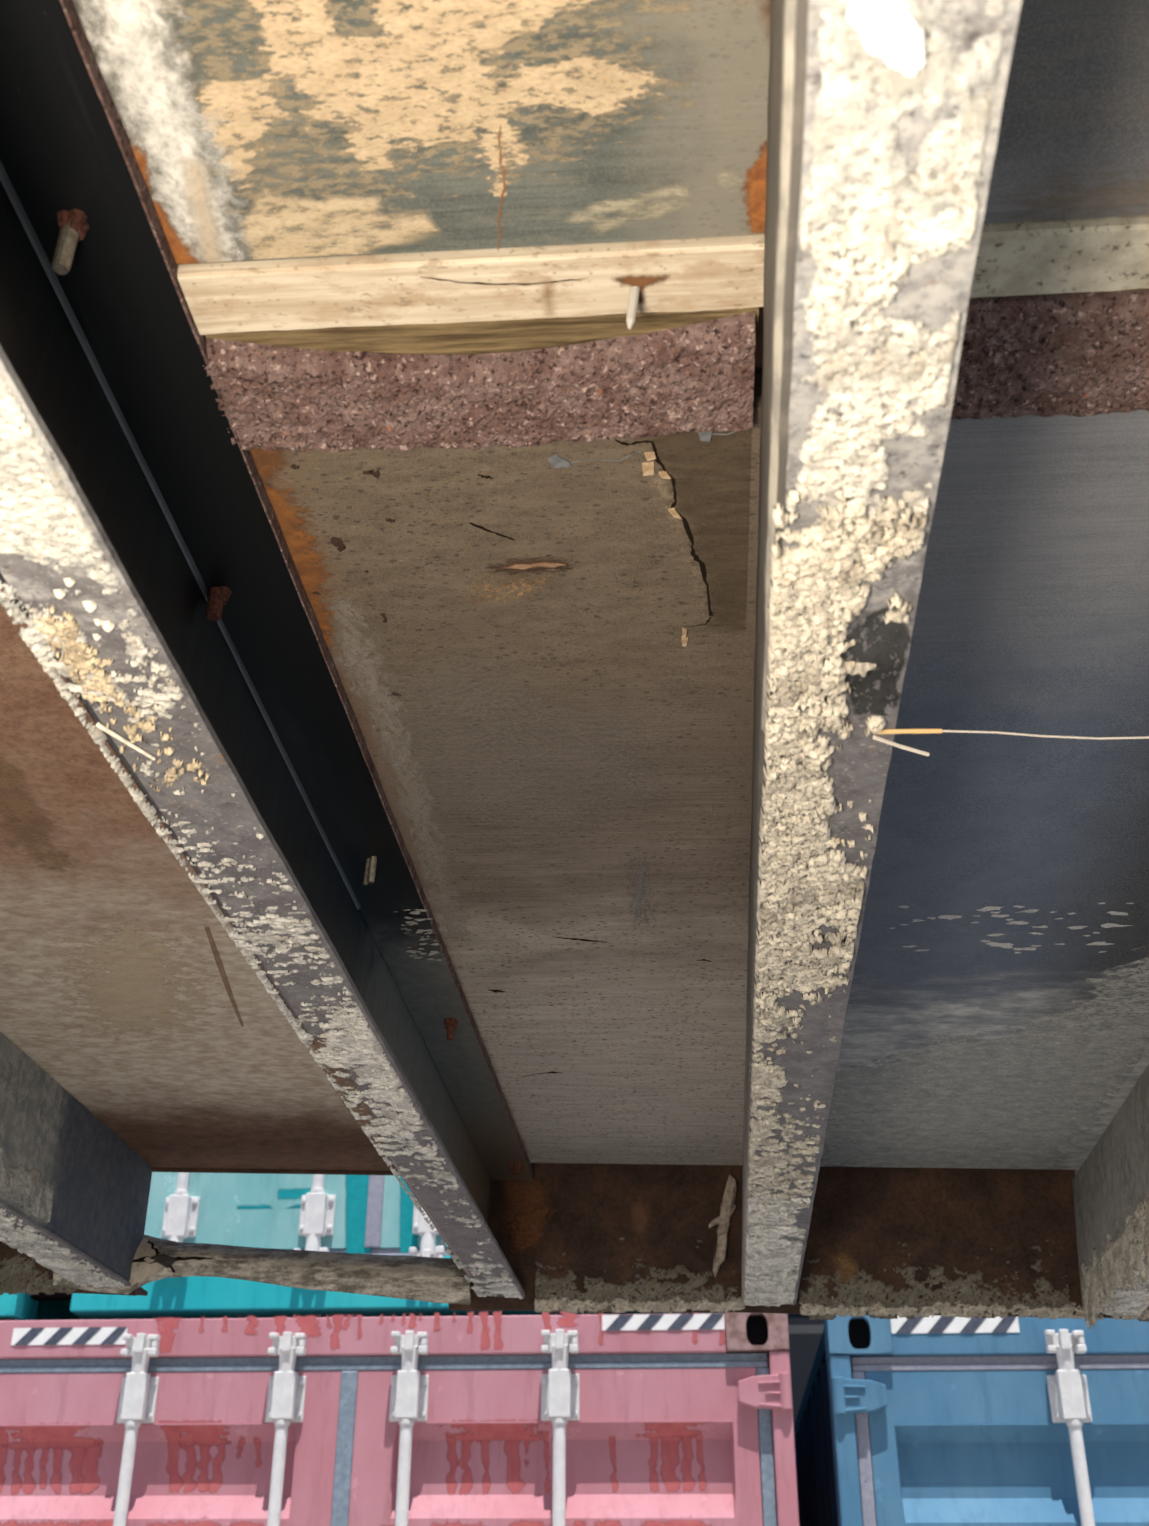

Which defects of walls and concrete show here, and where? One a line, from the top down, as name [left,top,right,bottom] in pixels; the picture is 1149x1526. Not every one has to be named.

peeling [155,0,759,260]
rust [744,141,767,234]
rust [202,311,755,655]
spalling [466,556,572,602]
crack [615,429,752,647]
peeling [534,0,1149,1330]
peeling [0,388,513,1297]
rust [205,927,244,1026]